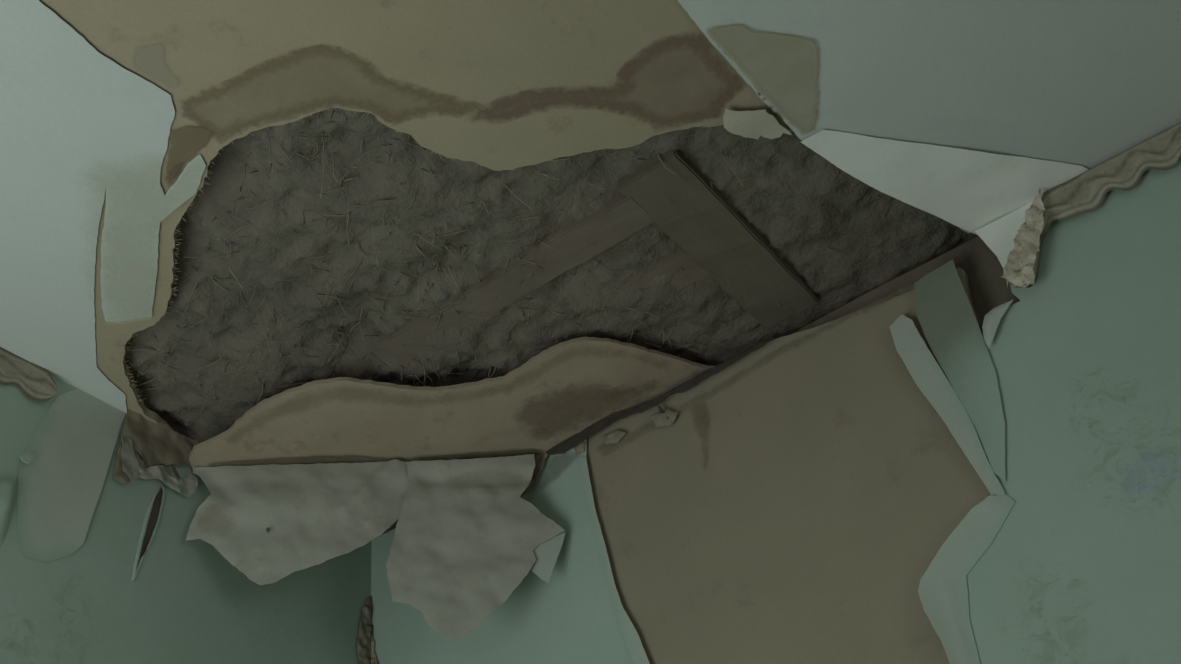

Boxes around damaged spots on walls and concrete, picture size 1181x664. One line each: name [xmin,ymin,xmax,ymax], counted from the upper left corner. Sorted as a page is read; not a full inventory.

water stain [183,25,818,140]
peeling [39,0,1089,431]
peeling [586,289,991,664]